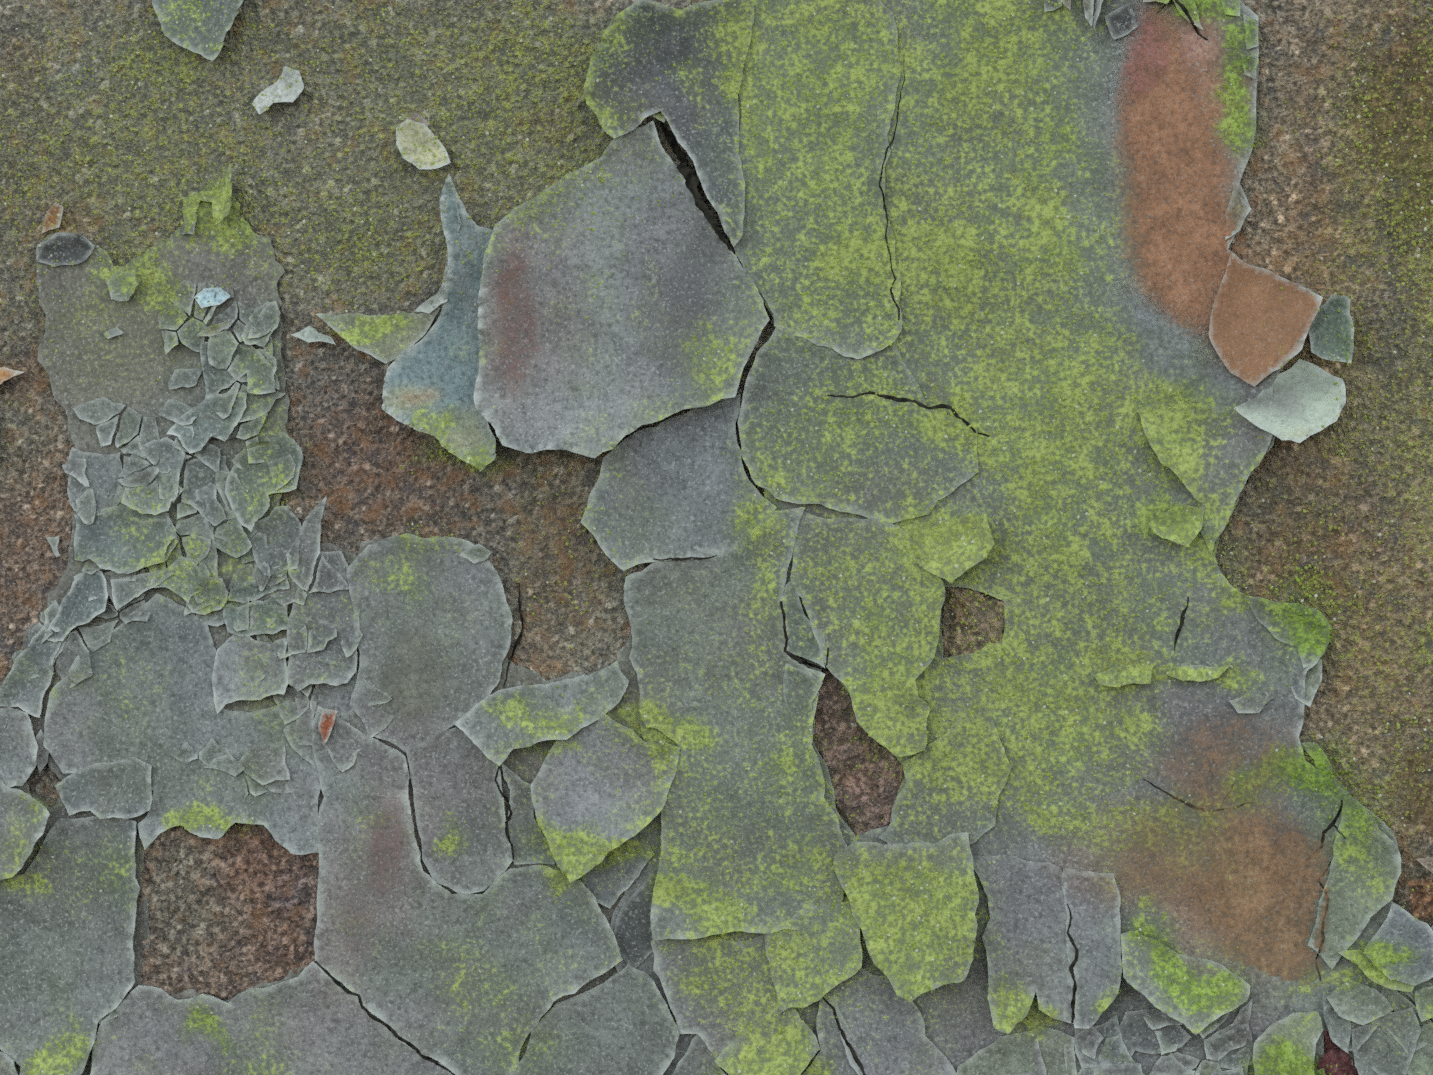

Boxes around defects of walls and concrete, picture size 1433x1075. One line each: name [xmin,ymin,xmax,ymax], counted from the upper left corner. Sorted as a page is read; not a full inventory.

peeling [152,0,243,62]
peeling [252,66,304,115]
crack [659,122,732,251]
rust [1120,8,1246,332]
leakage [1118,297,1241,413]
crack [828,391,989,437]
rust [1138,734,1329,984]
crack [1307,800,1346,981]
rust [1408,877,1433,920]
crack [315,961,455,1075]
crack [822,997,866,1075]
crack [1066,903,1079,1023]